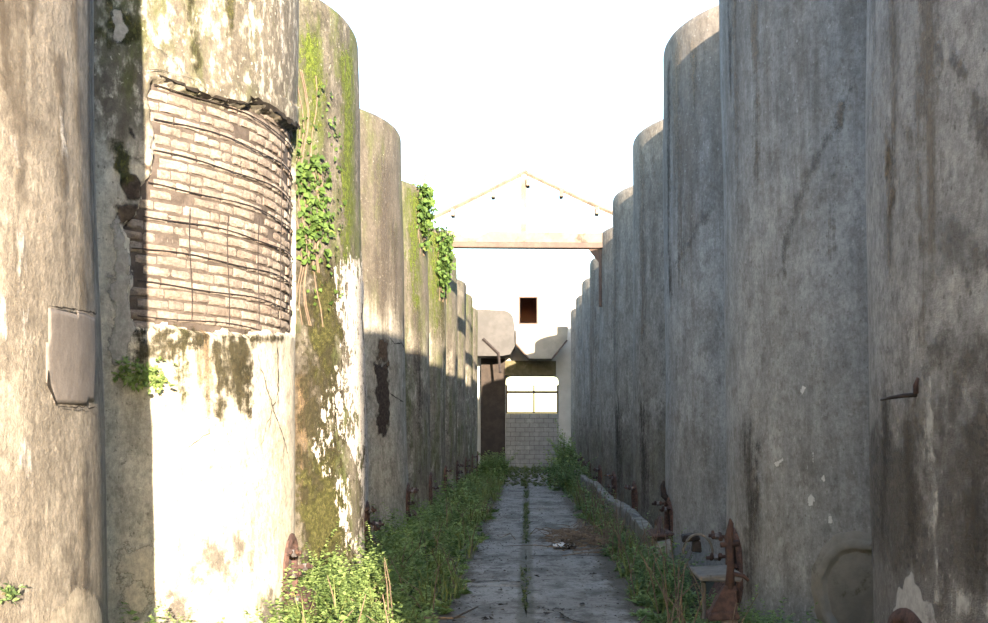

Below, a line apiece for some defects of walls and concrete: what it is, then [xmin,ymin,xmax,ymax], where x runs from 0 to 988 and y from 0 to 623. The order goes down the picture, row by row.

peeling [110,9,128,43]
spalling [107,45,299,366]
damp [915,0,988,266]
damp [133,326,284,419]
peeling [311,249,390,571]
damp [744,424,758,595]
damp [869,336,988,589]
damp [935,589,971,618]